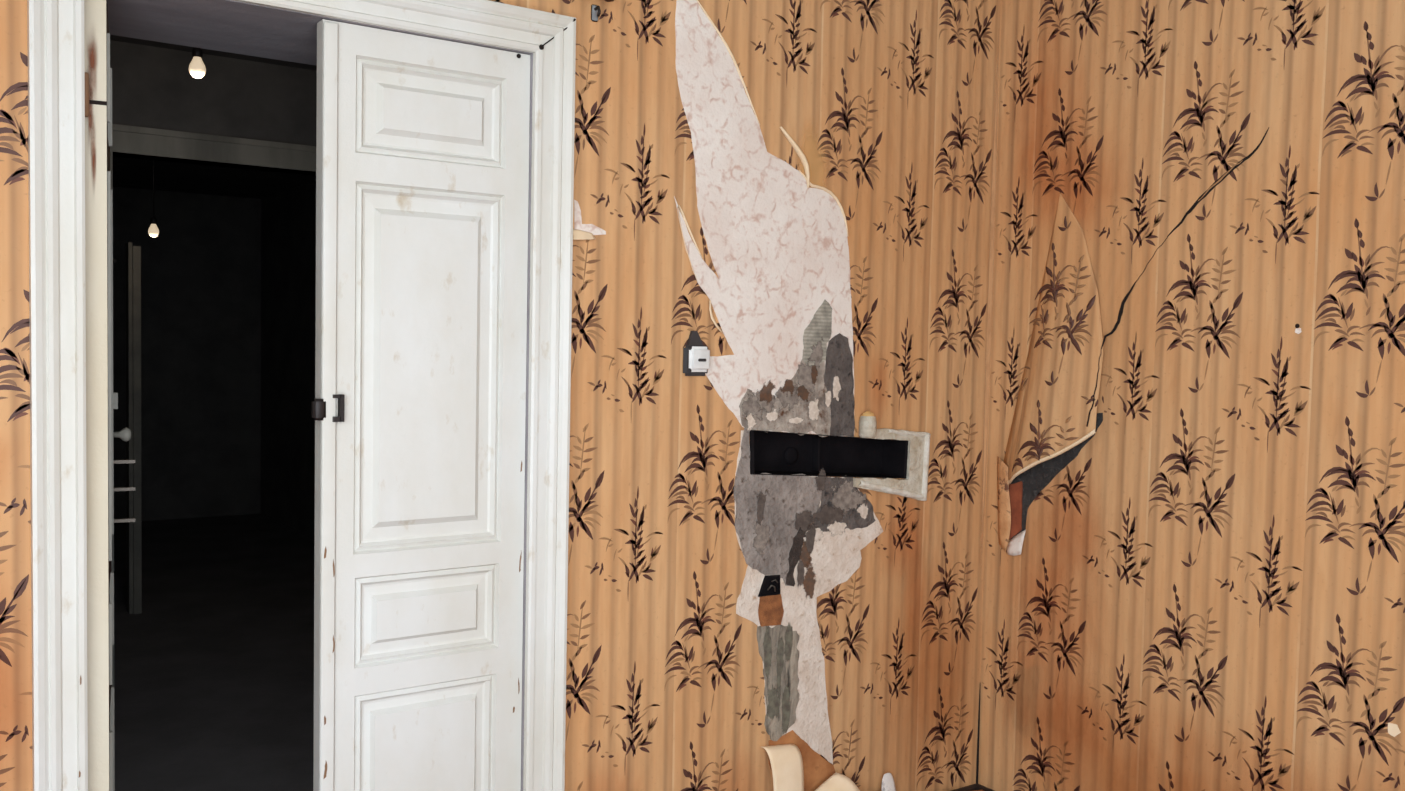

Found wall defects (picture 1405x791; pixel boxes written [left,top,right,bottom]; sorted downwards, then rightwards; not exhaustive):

crack [1086,128,1269,427]
flaking render [734,333,876,741]
flaking render [1010,413,1103,540]